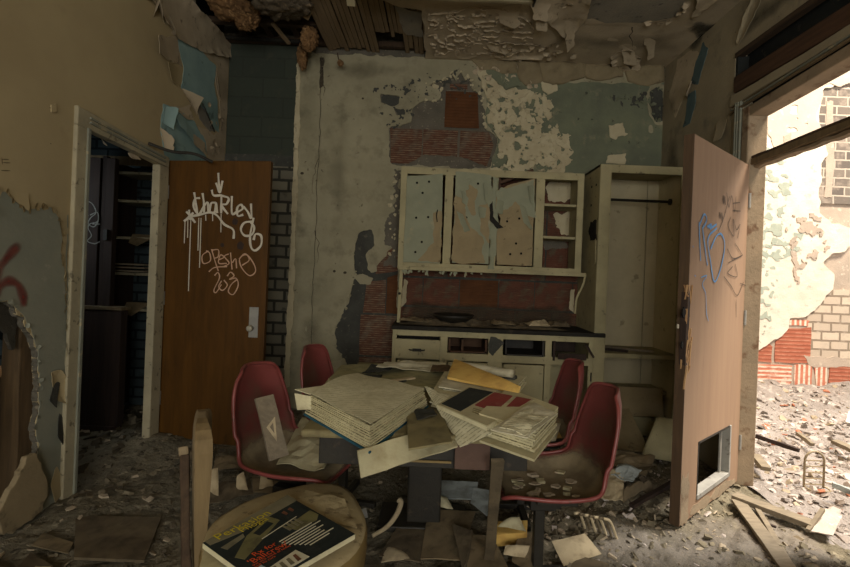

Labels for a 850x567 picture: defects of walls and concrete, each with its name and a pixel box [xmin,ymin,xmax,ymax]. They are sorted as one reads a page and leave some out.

peeling [0,187,69,512]
peeling [153,0,231,161]
flaking render [331,0,718,373]
peeling [736,0,761,44]
flaking render [758,142,850,386]
flaking render [767,71,850,150]